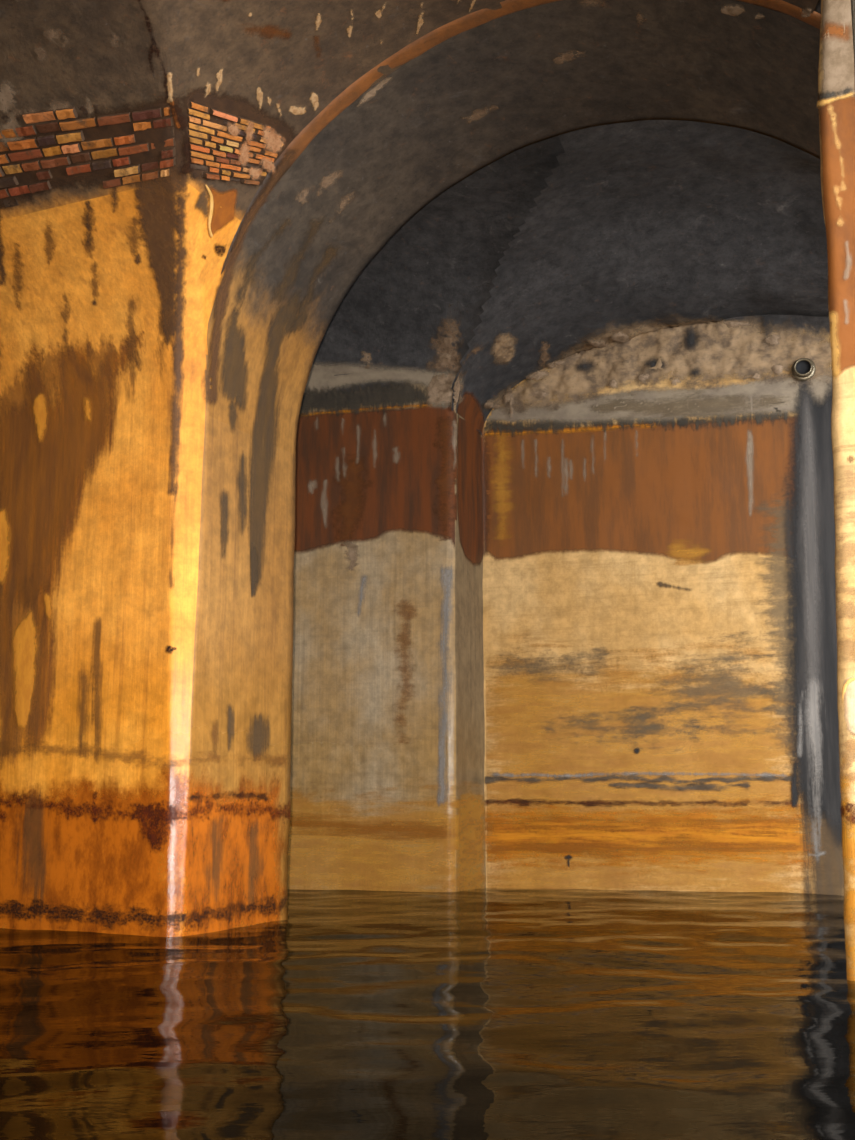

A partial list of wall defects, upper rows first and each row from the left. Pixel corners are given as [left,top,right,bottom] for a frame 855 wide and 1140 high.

water stain [85,201,98,305]
flaking render [0,80,298,259]
water stain [129,164,188,495]
crack [138,0,193,173]
water stain [196,67,223,96]
water stain [206,121,343,596]
water stain [256,87,319,116]
rust [817,93,855,376]
water stain [0,295,144,760]
rust [294,392,797,565]
water stain [484,371,855,896]
rust [0,768,815,937]